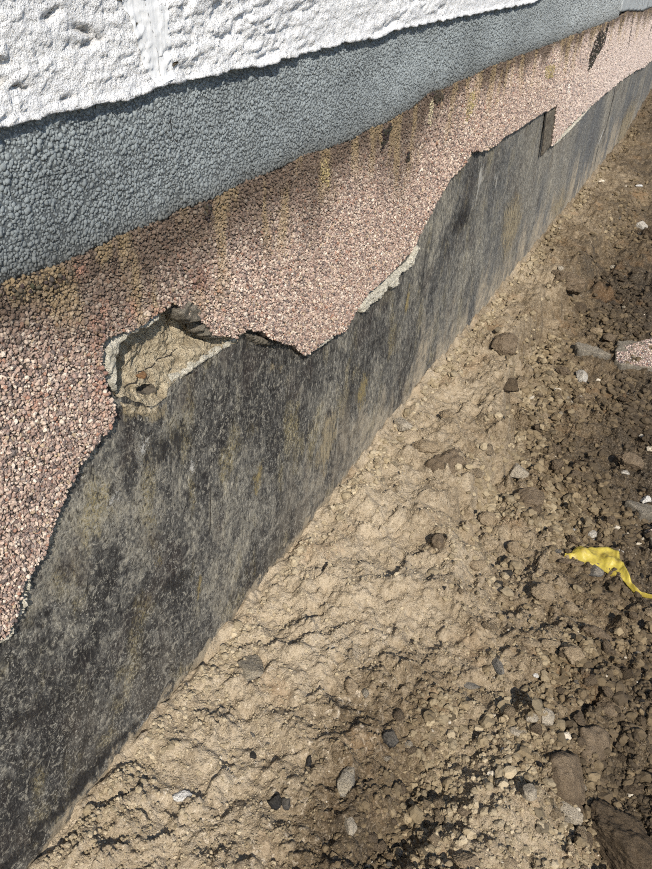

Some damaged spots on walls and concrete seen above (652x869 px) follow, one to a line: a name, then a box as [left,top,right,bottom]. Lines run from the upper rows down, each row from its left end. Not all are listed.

damp [588,21,610,72]
spalling [357,245,421,313]
spalling [101,299,275,417]
spalling [0,575,32,643]